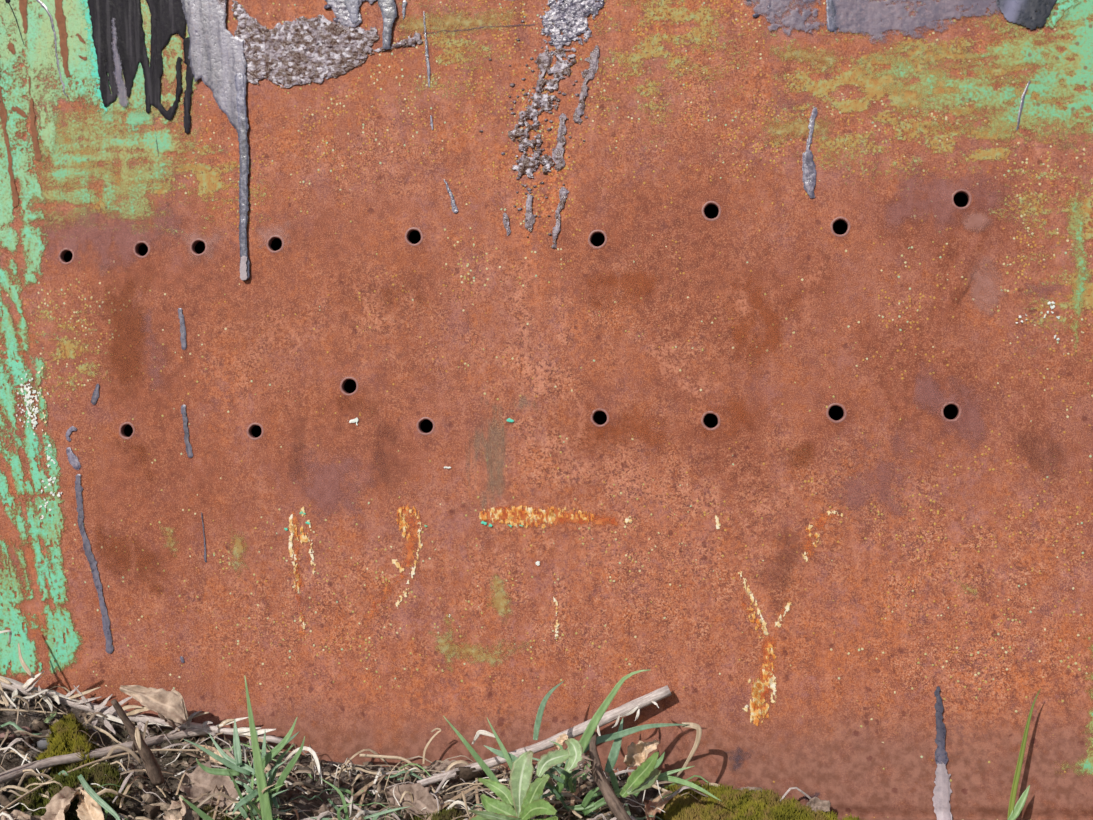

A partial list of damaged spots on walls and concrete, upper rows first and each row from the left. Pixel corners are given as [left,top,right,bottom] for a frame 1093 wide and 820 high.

rust [54,0,87,78]
peeling [860,0,1093,144]
peeling [0,0,197,677]
peeling [1067,199,1091,348]
peeling [1062,675,1093,775]